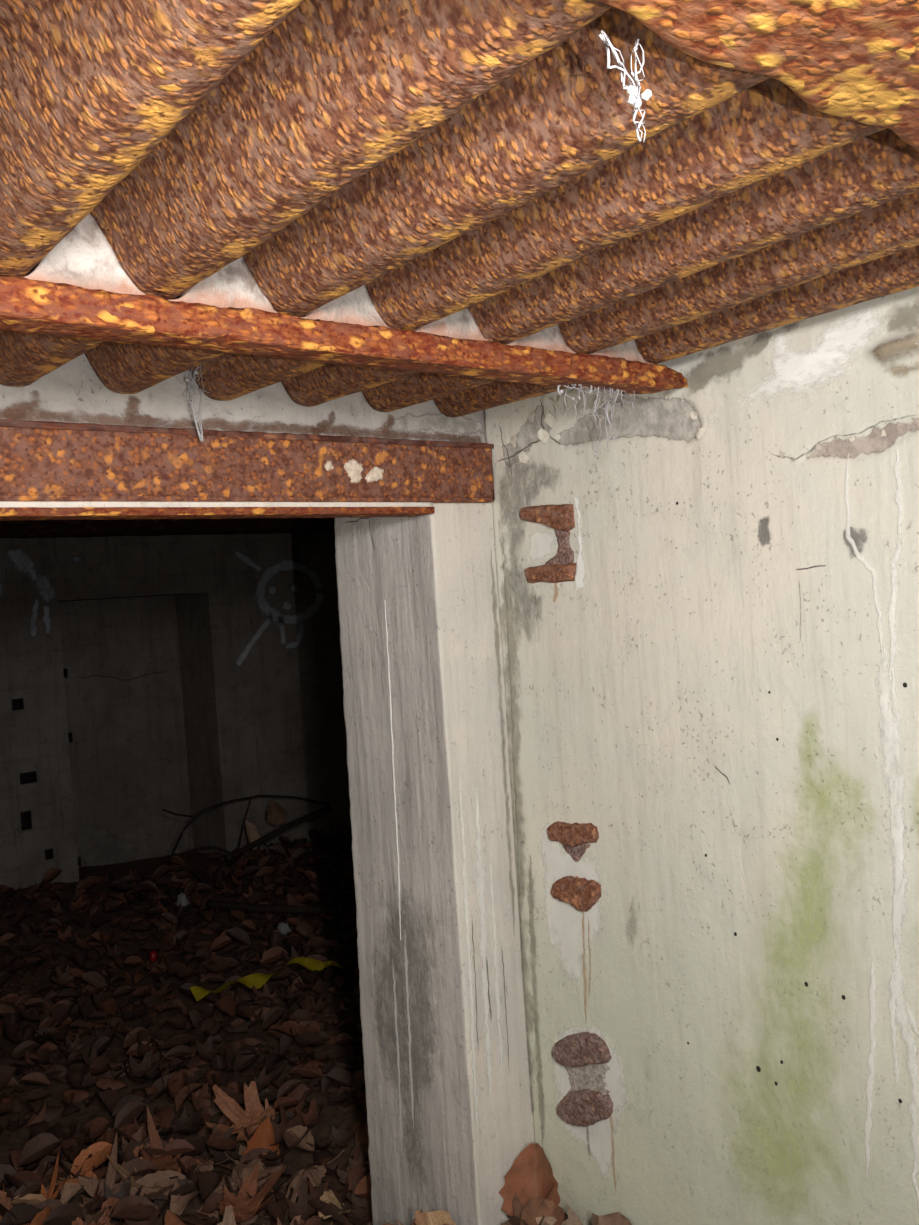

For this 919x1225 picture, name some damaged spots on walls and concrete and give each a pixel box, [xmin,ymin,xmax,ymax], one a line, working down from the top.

spalling [386,413,482,434]
spalling [497,390,706,475]
spalling [775,418,919,460]
leakage [384,600,414,1151]